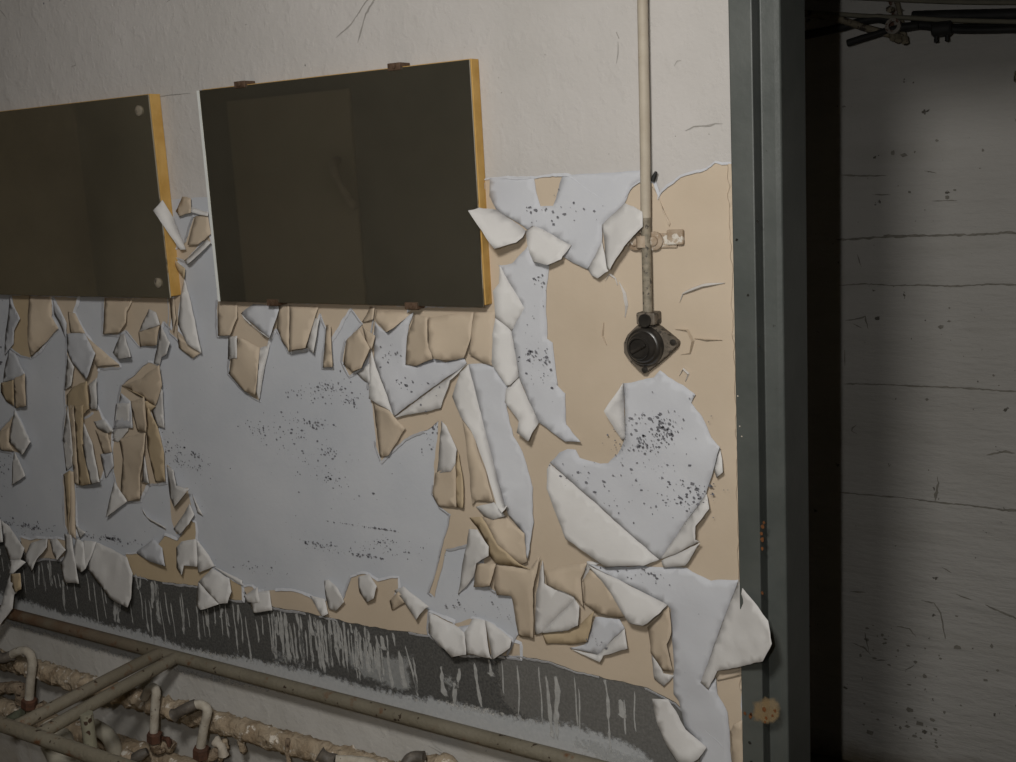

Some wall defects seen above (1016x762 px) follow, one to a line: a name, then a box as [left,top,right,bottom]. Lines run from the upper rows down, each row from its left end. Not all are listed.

crack [337,0,374,40]
water stain [287,370,361,408]
water stain [237,411,349,494]
peeling [0,161,772,762]
water stain [299,521,410,560]
water stain [0,549,652,762]